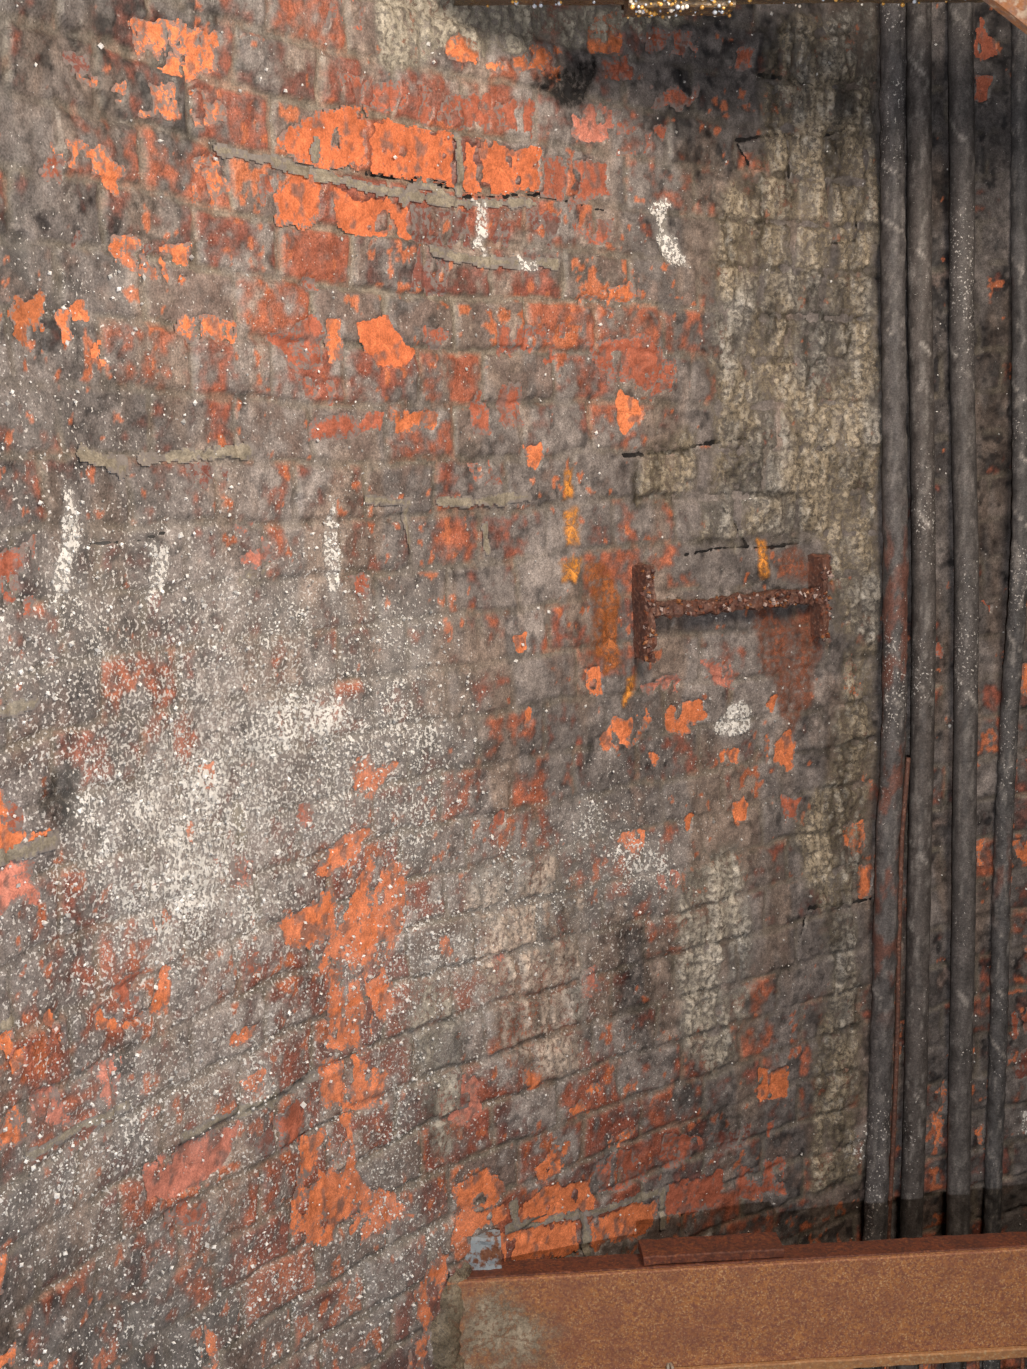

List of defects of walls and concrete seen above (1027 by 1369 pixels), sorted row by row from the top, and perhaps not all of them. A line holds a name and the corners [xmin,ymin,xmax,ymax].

spalling [444,32,563,83]
spalling [258,71,700,299]
rust [563,470,619,673]
leakage [632,6,883,1193]
rust [757,540,809,577]
rust [756,609,820,728]
leakage [0,489,752,1369]
spalling [0,1053,122,1159]
spalling [142,1119,241,1231]
spalling [254,828,415,1247]
spalling [407,1120,787,1369]
spalling [757,1065,789,1102]